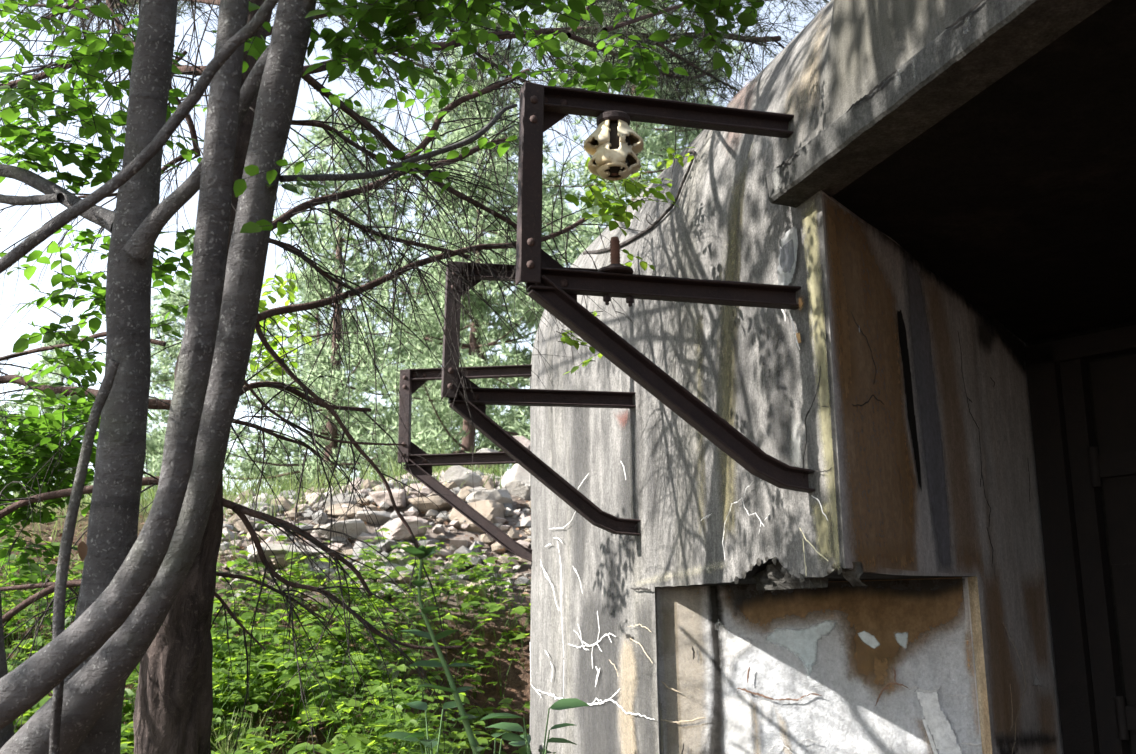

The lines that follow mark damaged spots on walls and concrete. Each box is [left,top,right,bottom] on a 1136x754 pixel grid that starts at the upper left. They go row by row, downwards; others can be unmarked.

crack [701,482,770,558]
spalling [734,556,867,591]
crack [530,473,706,754]
peeling [767,621,835,673]
peeling [858,631,879,648]
peeling [896,633,907,648]